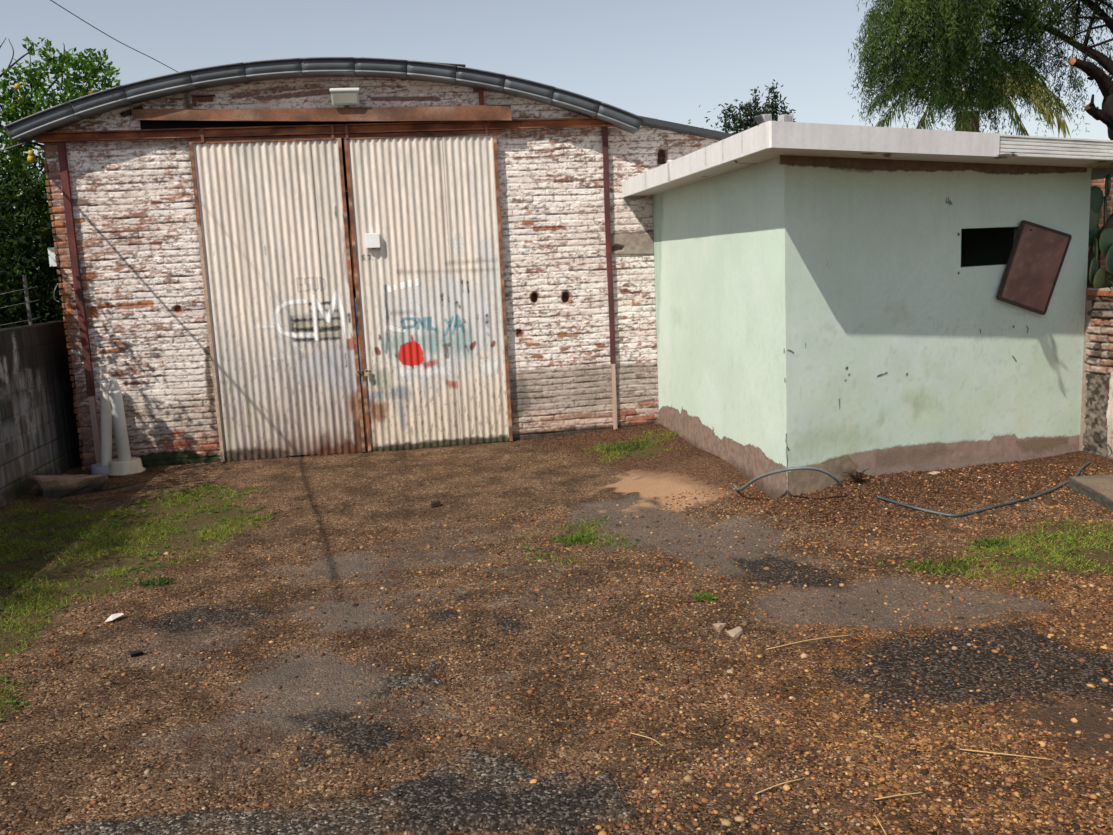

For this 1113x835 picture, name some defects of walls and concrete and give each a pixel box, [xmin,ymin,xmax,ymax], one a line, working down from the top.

peeling [52,207,85,245]
peeling [522,221,566,243]
peeling [60,264,153,362]
spalling [561,292,572,305]
peeling [515,330,542,358]
leakage [0,337,36,441]
spalling [204,347,216,422]
rust [311,395,385,456]
peeling [540,399,856,499]